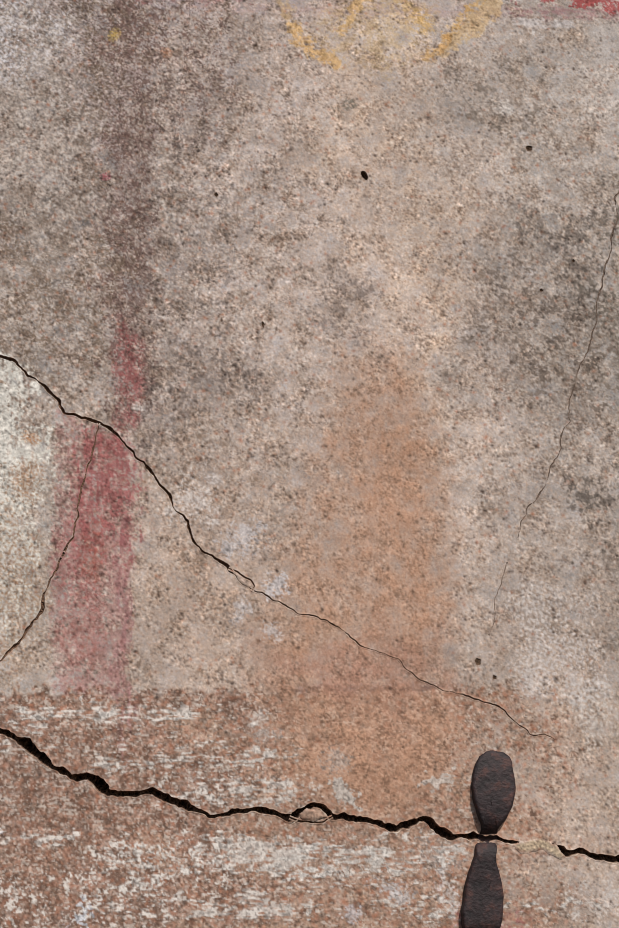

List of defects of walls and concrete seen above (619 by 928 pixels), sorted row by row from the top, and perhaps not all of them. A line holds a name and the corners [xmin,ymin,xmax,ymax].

crack [516,188,619,540]
crack [0,354,555,741]
crack [0,727,619,865]